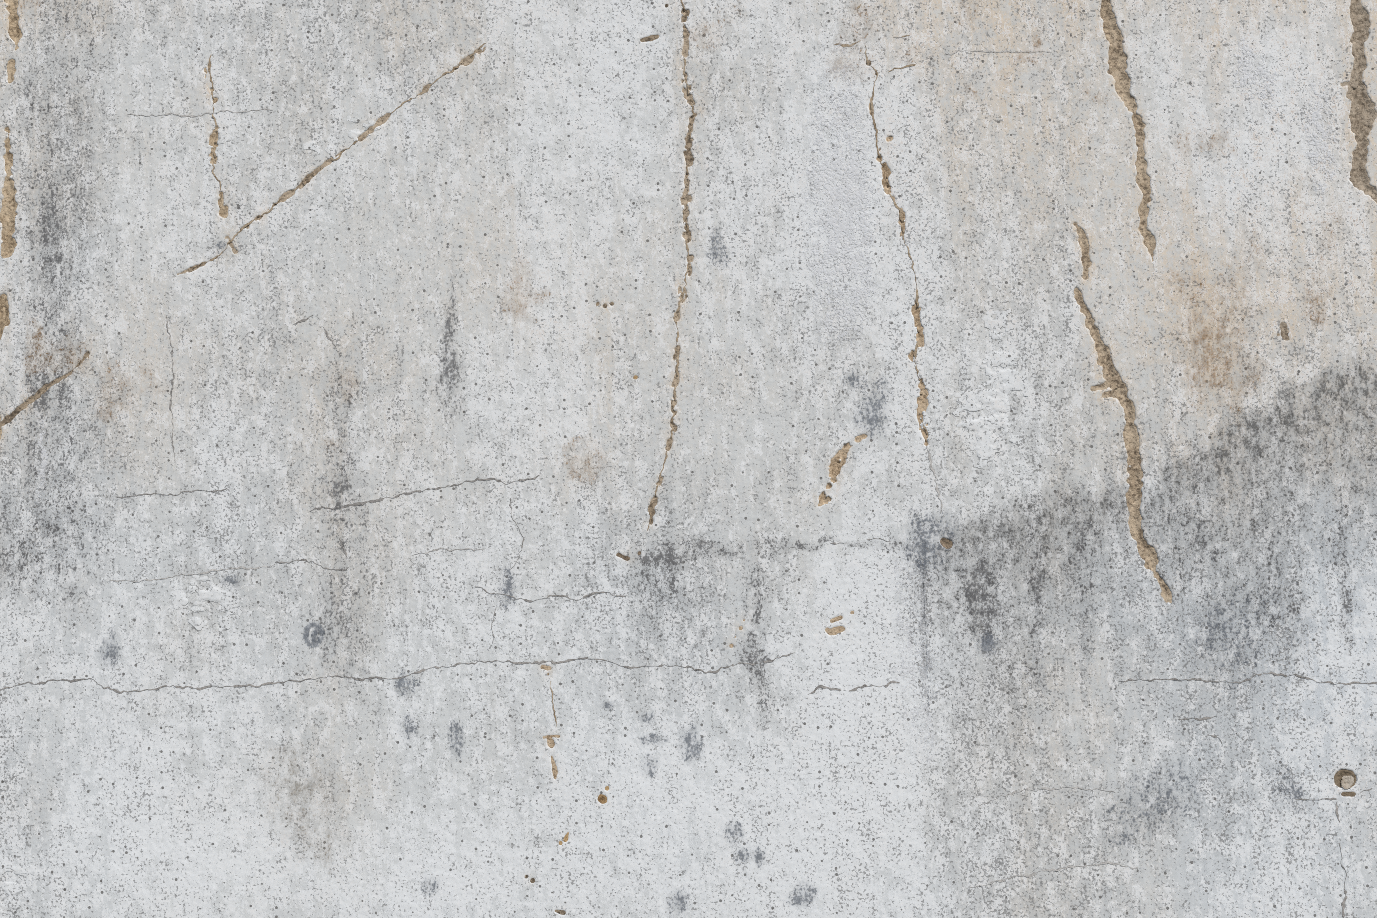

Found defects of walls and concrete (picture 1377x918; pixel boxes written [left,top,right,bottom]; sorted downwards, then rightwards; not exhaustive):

crack [0,127,18,259]
crack [0,351,90,439]
crack [127,42,487,275]
crack [0,475,795,726]
crack [647,0,697,531]
crack [818,434,867,506]
crack [834,4,943,511]
leakage [896,484,1133,747]
crack [1073,222,1172,603]
crack [1100,0,1156,262]
leakage [1143,358,1377,675]
crack [1340,0,1377,203]